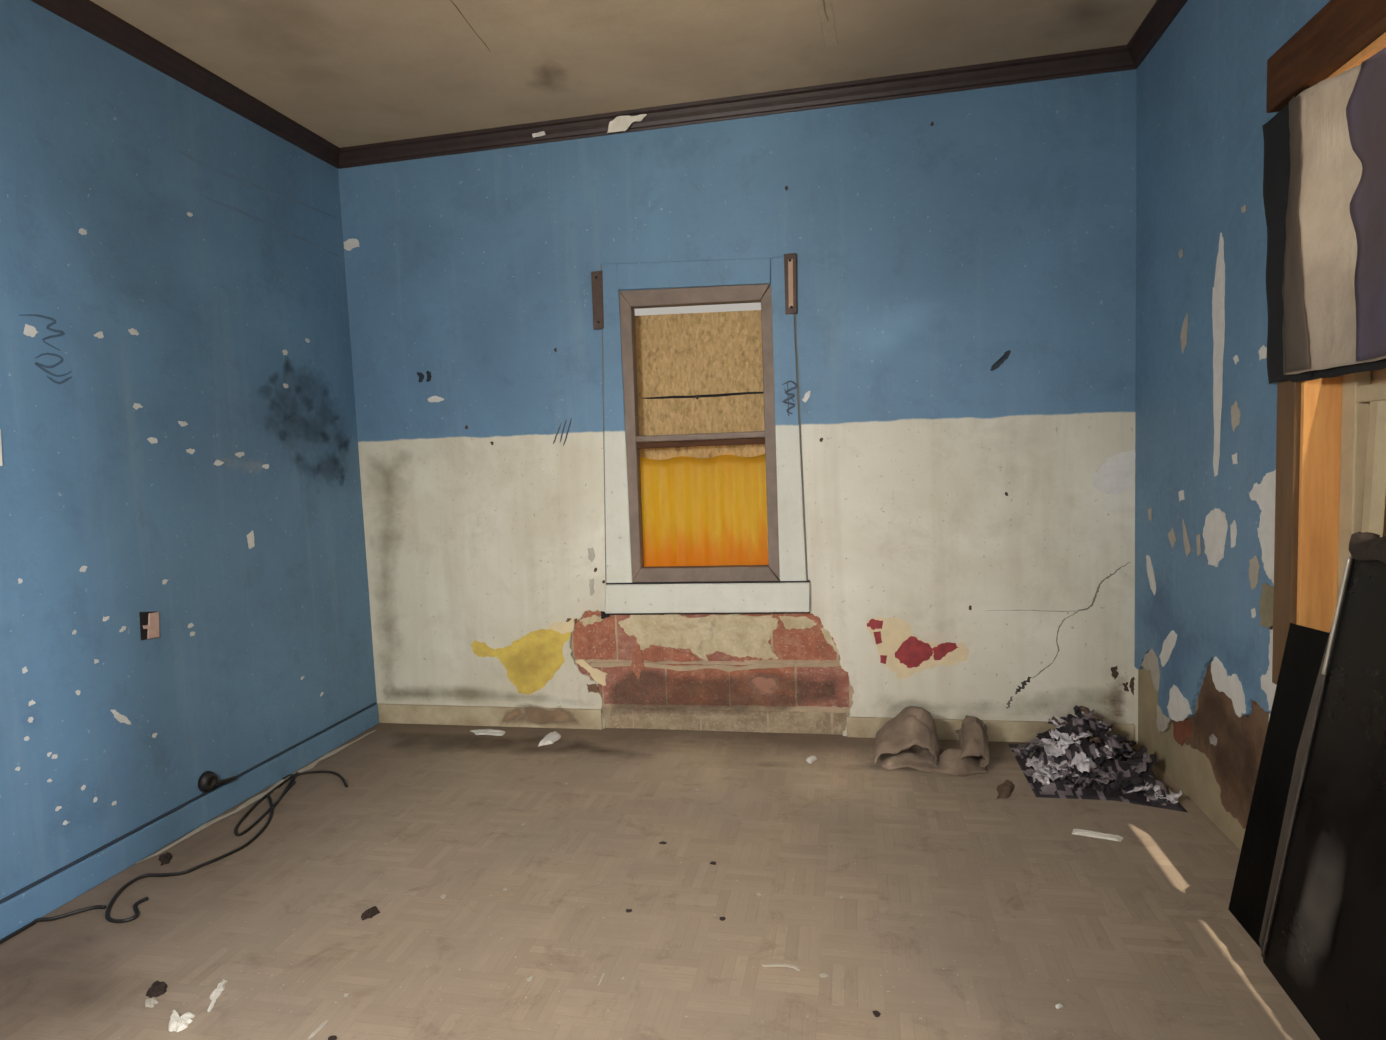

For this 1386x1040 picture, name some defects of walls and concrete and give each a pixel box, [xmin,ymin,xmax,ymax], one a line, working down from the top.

crack [450,0,490,51]
peeling [1212,233,1240,477]
spalling [471,547,854,735]
peeling [867,617,970,679]
crack [985,562,1130,679]
spalling [1141,469,1277,829]